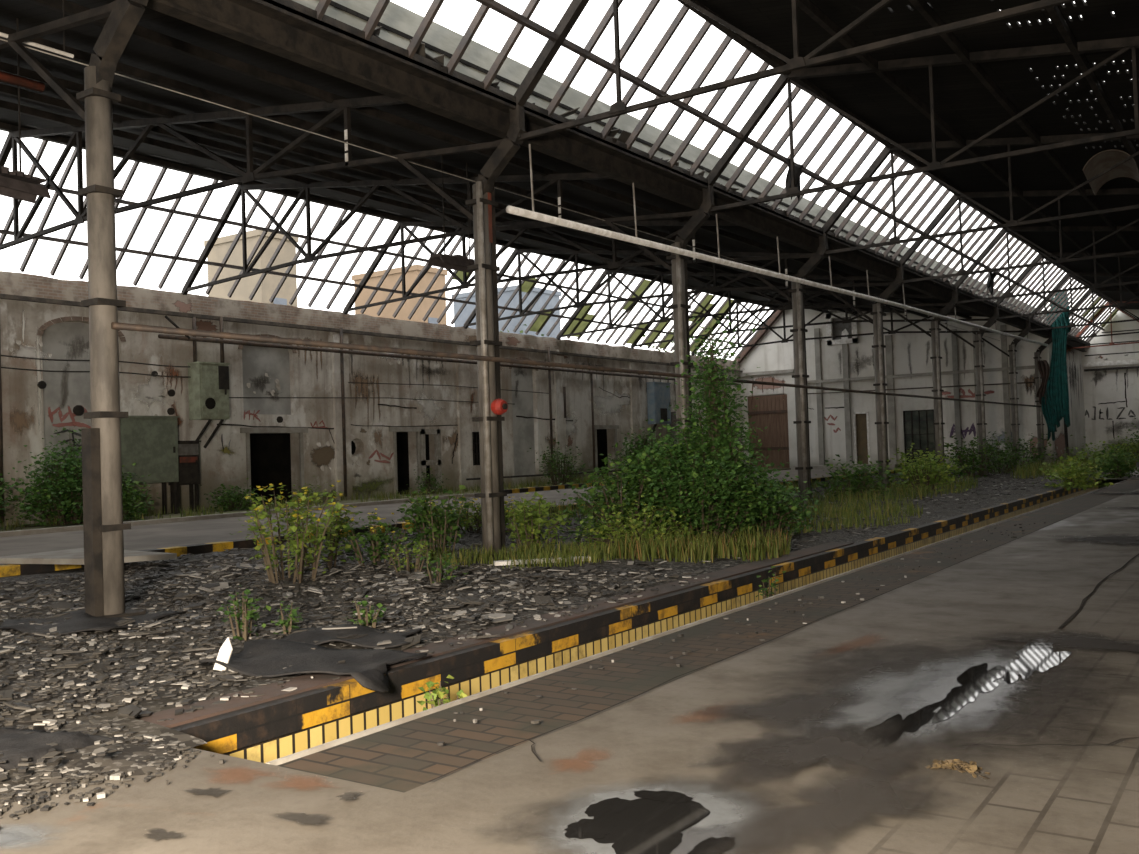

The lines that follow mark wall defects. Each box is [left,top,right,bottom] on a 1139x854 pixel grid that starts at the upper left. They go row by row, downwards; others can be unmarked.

flaking render [310,441,335,471]
crack [1058,554,1139,629]
damp [997,632,1139,653]
damp [710,690,929,846]